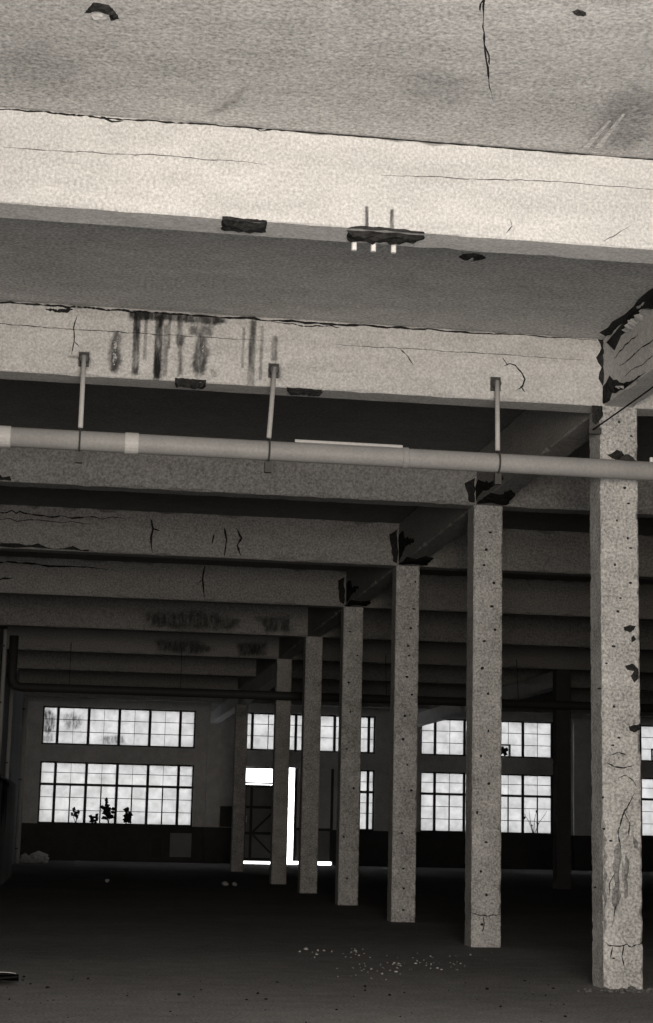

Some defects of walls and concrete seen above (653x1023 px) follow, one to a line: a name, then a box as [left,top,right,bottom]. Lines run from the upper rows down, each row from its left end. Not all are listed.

spalling [84,3,119,21]
crack [479,0,492,94]
damp [130,311,224,379]
crack [0,301,590,392]
spalling [592,288,653,425]
spalling [465,475,516,505]
crack [197,527,242,599]
spalling [338,577,372,607]
spalling [389,529,434,565]
spalling [625,664,639,682]